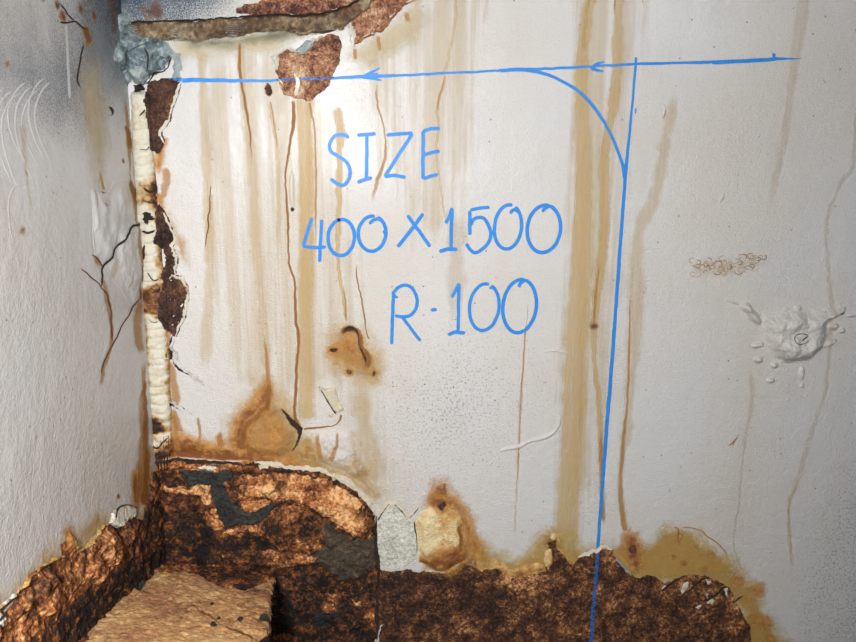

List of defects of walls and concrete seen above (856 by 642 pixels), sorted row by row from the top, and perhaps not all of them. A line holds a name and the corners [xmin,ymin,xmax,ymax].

peeling [118,13,145,48]
leakage [179,30,300,57]
rust [348,0,418,47]
leakage [354,11,420,64]
rust [238,44,252,151]
rust [270,34,342,417]
crack [82,223,160,382]
rust [0,91,751,642]
peeling [109,494,137,528]
peeling [376,500,419,570]
leakage [496,532,595,577]
leakage [613,527,781,642]